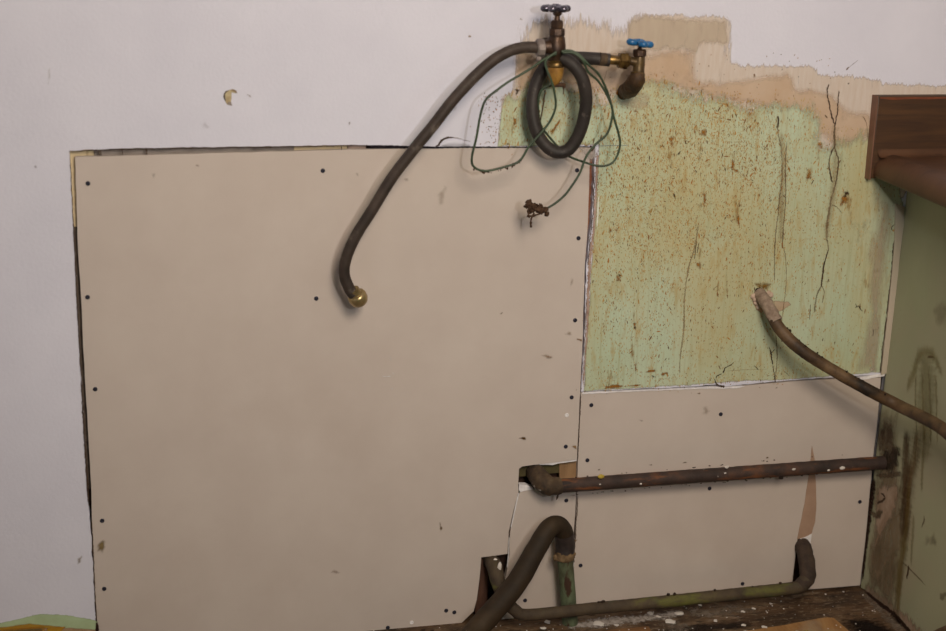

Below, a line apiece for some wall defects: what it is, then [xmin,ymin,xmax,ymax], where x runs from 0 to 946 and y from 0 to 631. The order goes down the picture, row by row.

rust [470,75,530,149]
peeling [498,13,946,394]
rust [576,63,900,392]
crack [809,85,841,319]
spalling [792,553,800,582]
water stain [871,420,918,608]